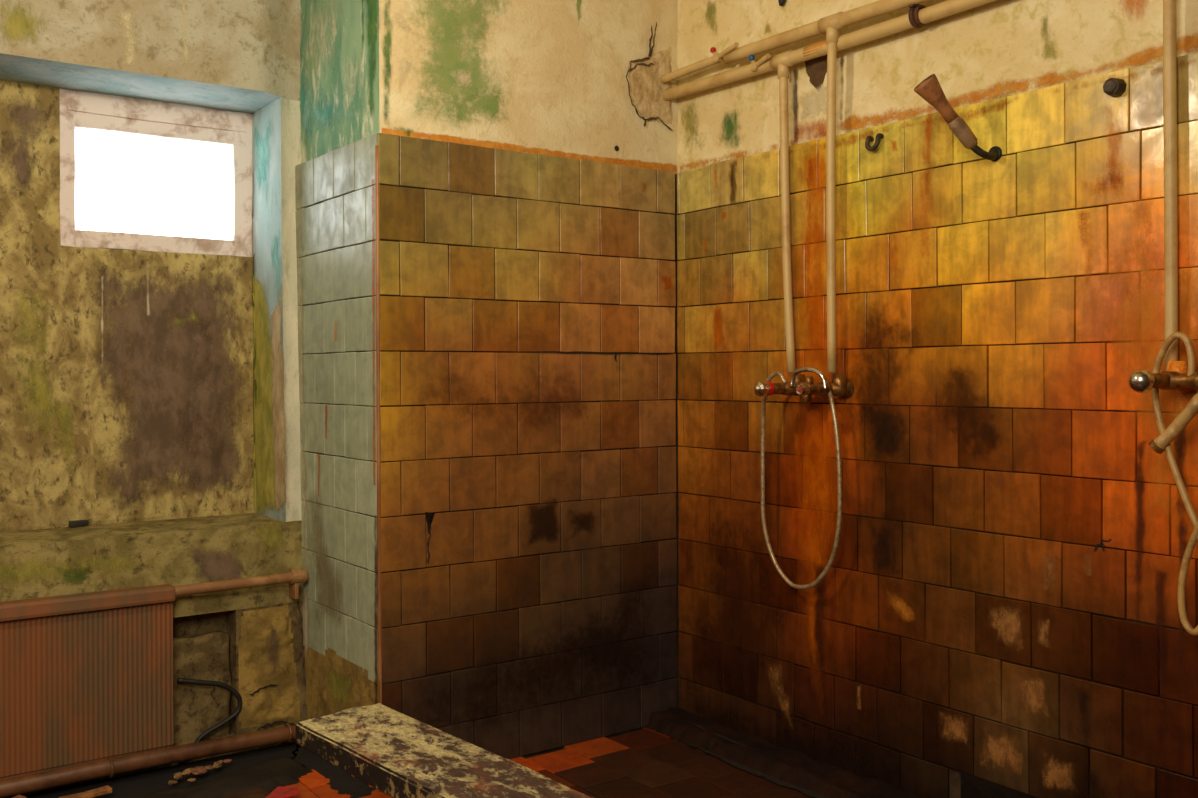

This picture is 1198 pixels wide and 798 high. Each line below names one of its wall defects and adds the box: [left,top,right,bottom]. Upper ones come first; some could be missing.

flaking render [628,46,673,124]
damp [96,270,239,506]
damp [992,608,1022,646]
damp [1017,680,1045,712]
damp [943,716,966,742]
damp [984,736,1022,773]
damp [1042,760,1072,788]